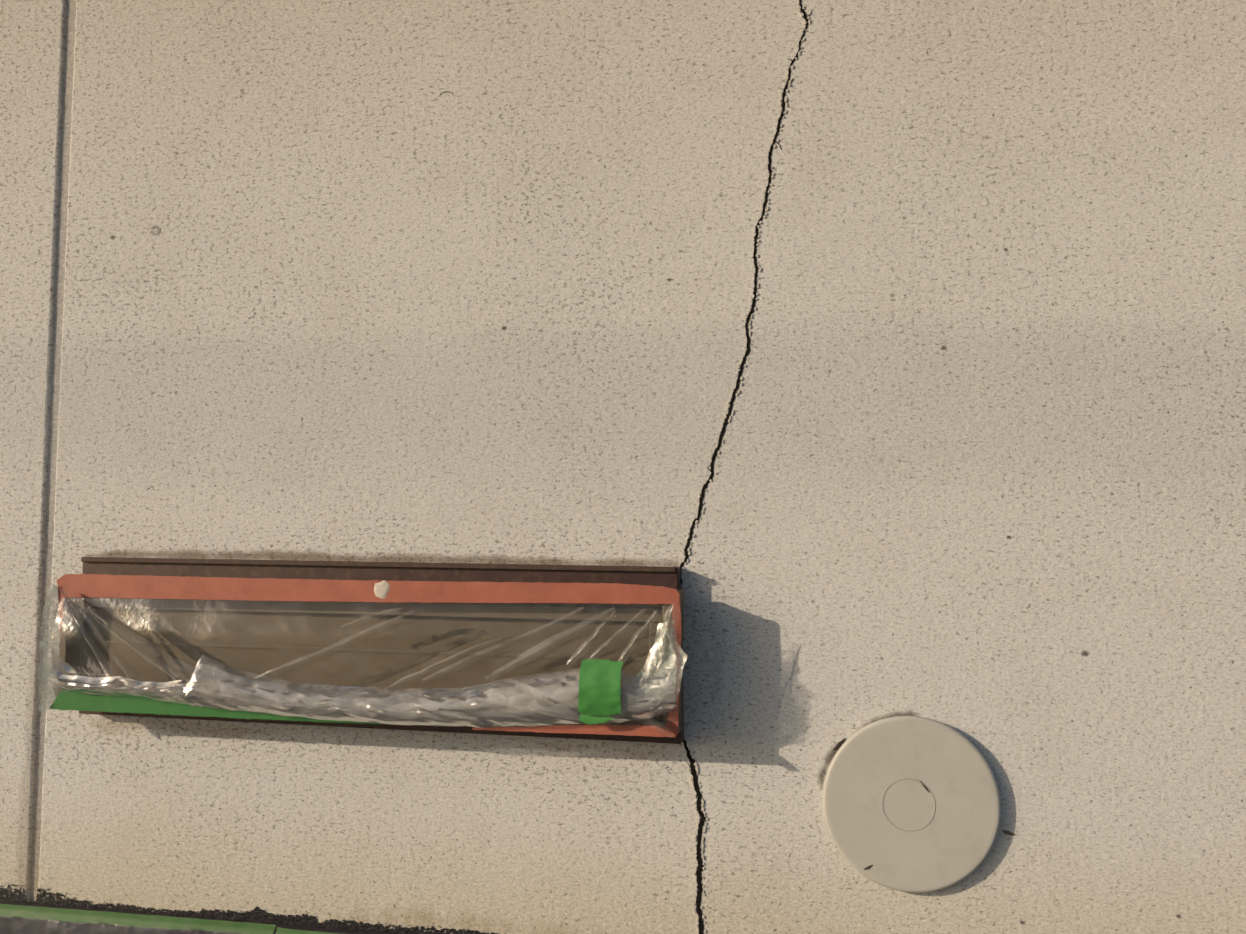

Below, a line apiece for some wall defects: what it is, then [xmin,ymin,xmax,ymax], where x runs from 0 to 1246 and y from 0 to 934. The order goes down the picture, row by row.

crack [679,0,813,586]
crack [681,735,708,934]